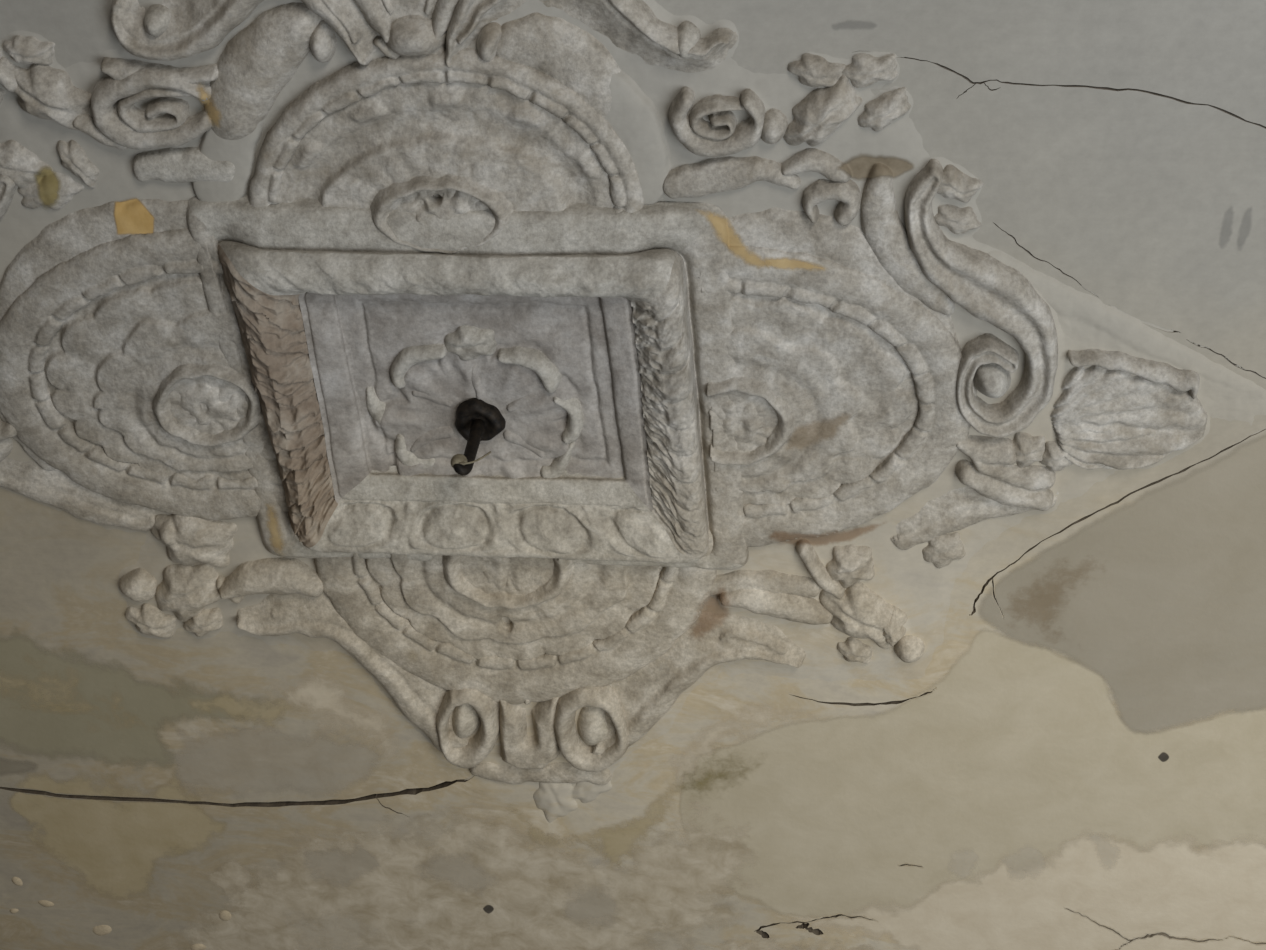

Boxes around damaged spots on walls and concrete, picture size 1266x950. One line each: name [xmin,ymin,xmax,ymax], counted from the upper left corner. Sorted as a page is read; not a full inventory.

crack [900,57,1266,129]
crack [969,429,1266,616]
crack [0,777,473,817]
peeling [680,631,1266,950]
crack [1065,908,1266,950]